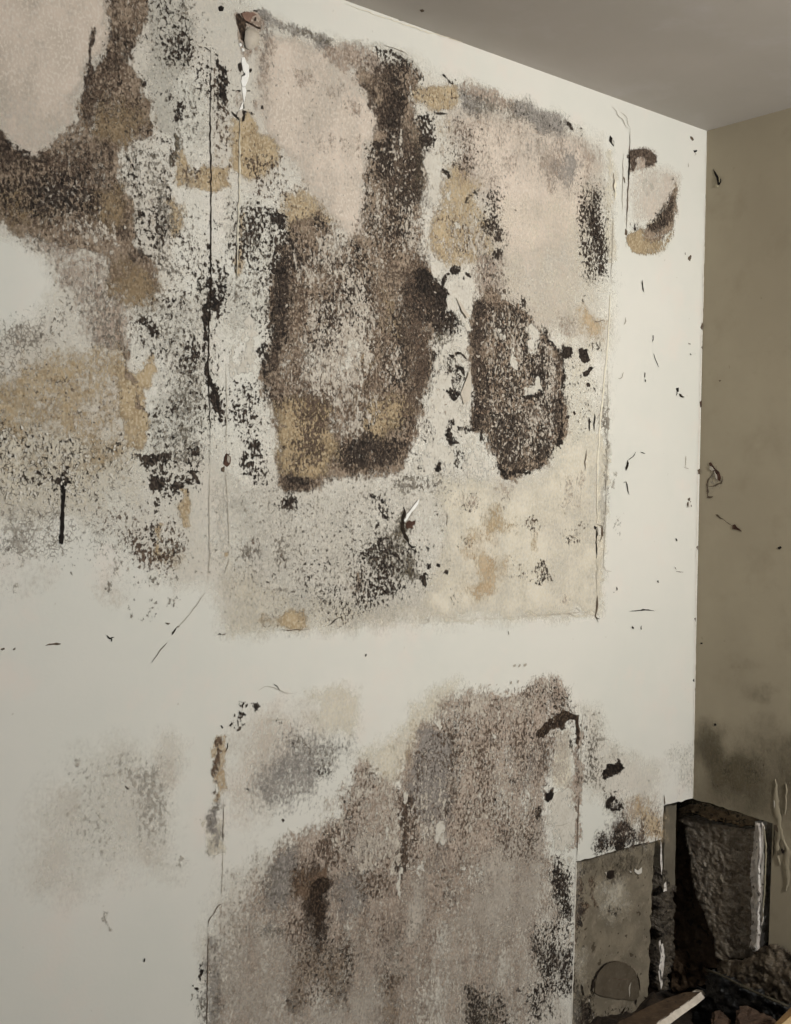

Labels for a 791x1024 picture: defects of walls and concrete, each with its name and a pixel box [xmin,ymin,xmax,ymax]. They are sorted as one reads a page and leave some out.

crack [205,47,238,427]
water stain [0,0,615,631]
crack [616,111,630,235]
water stain [626,148,678,255]
crack [152,454,210,662]
water stain [191,676,656,1024]
spalling [676,798,764,827]
peeling [648,940,672,995]